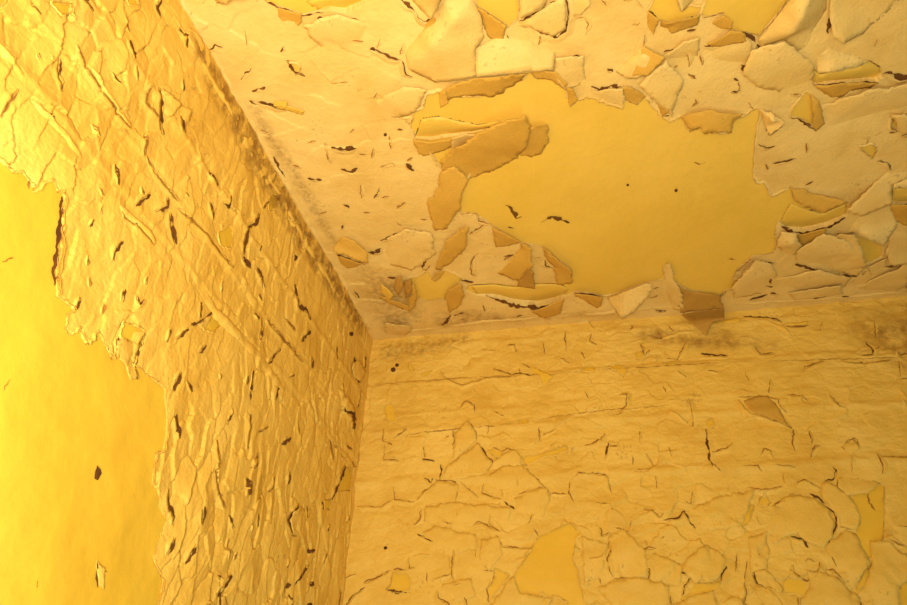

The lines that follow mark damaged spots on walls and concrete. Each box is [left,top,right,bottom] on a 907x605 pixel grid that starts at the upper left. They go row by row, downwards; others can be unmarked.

crack [153,0,189,48]
peeling [264,0,361,26]
crack [35,17,314,605]
crack [241,69,426,255]
peeling [333,237,368,268]
crack [542,215,570,223]
peeling [376,0,907,336]
crack [720,258,907,301]
peeling [0,157,169,605]
crack [283,287,907,605]
peeling [596,529,727,605]
peeling [734,476,907,605]